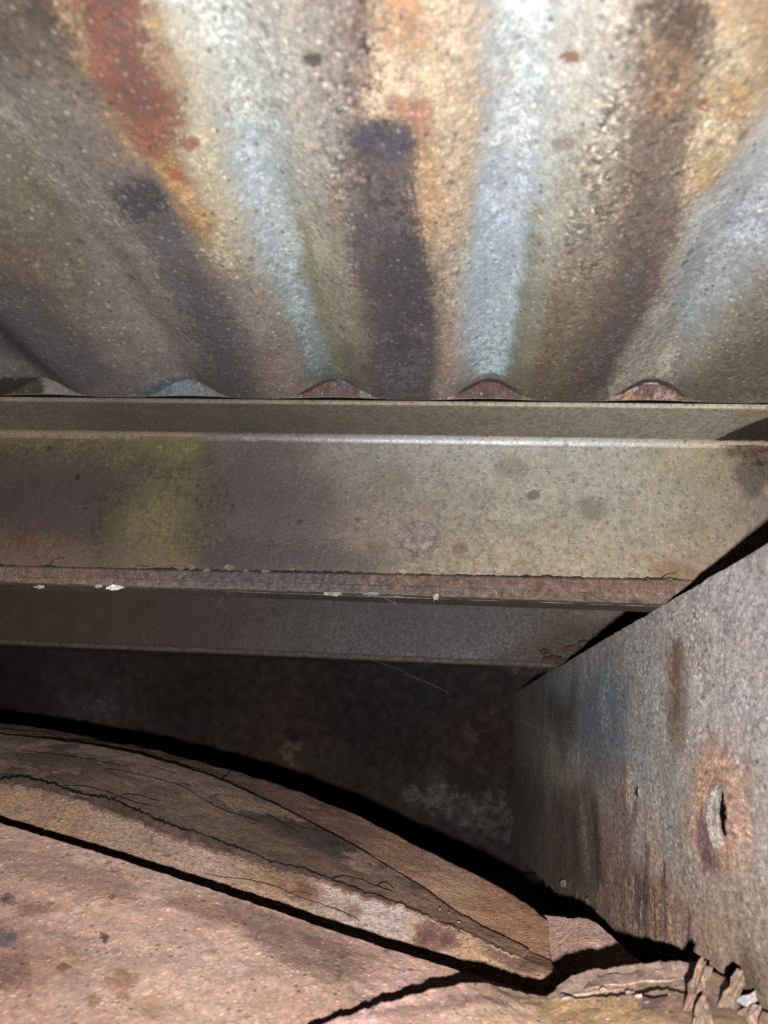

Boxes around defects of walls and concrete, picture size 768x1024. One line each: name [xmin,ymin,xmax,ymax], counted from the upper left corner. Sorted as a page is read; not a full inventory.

corrosion [54,0,217,242]
leakage [111,14,438,400]
leakage [608,134,768,400]
crack [0,750,457,928]
corrosion [392,561,693,590]
corrosion [483,765,768,1024]
corrosion [664,634,687,753]
corrosion [690,743,756,879]